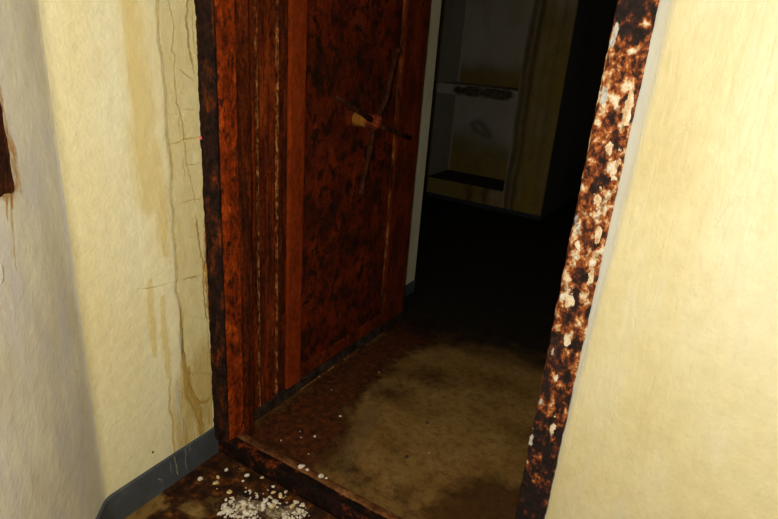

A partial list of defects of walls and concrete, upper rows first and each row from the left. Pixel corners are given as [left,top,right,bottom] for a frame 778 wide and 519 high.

crack [168,0,194,81]
leakage [123,0,167,246]
rust [3,129,18,241]
crack [188,222,206,316]
leakage [149,284,213,475]